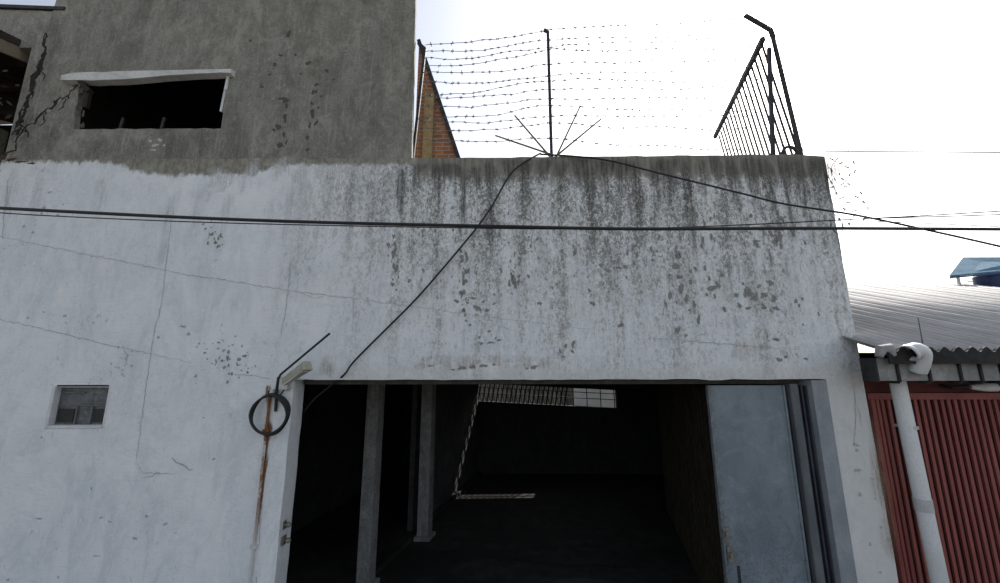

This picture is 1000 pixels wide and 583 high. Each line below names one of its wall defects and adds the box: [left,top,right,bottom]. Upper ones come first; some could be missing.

crack [7,33,80,153]
leakage [434,160,642,222]
leakage [699,158,838,210]
crack [0,180,600,478]
corrosion [259,422,272,516]